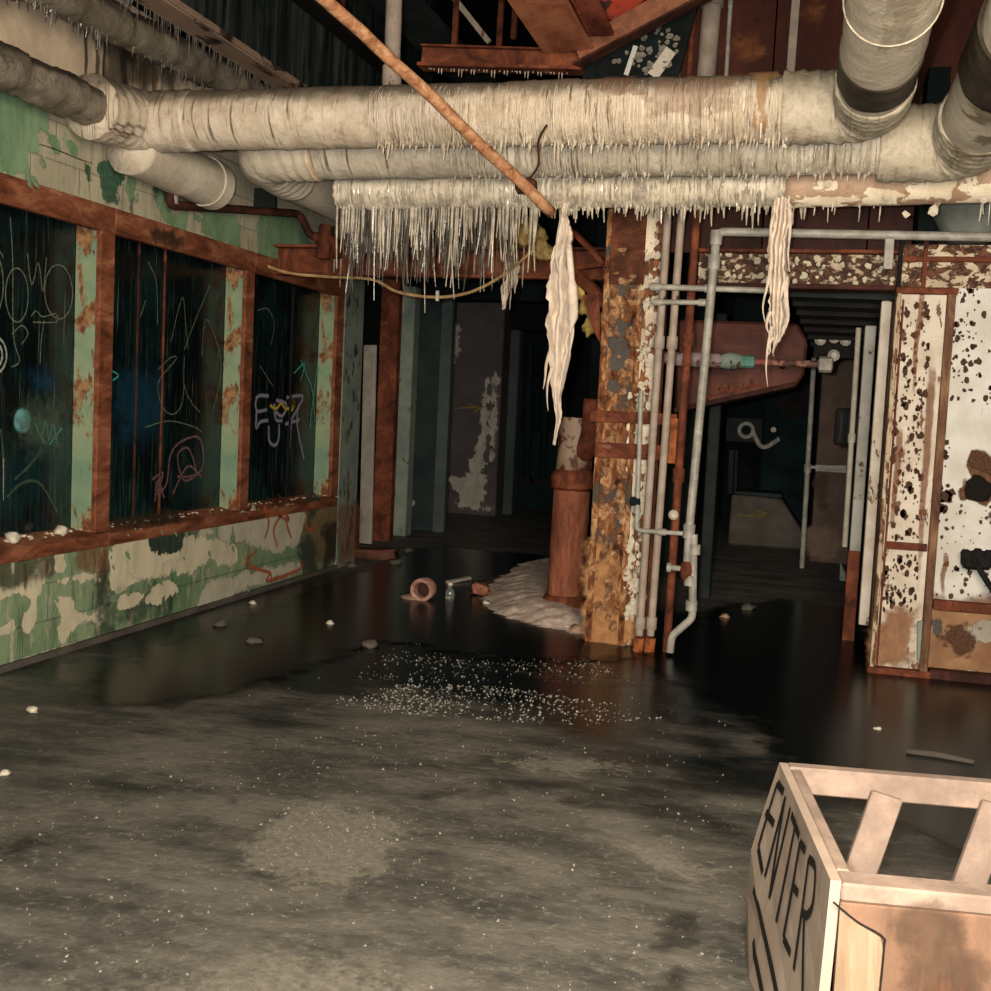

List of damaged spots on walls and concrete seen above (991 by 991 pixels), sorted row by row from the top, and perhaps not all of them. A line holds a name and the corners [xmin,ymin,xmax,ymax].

peeling [0,91,92,189]
peeling [152,188,242,247]
peeling [256,215,312,259]
peeling [453,321,463,369]
peeling [448,363,501,512]
rust [886,297,935,544]
peeling [0,503,307,659]
rust [581,545,635,646]
rust [869,554,919,666]
peeling [931,617,991,658]